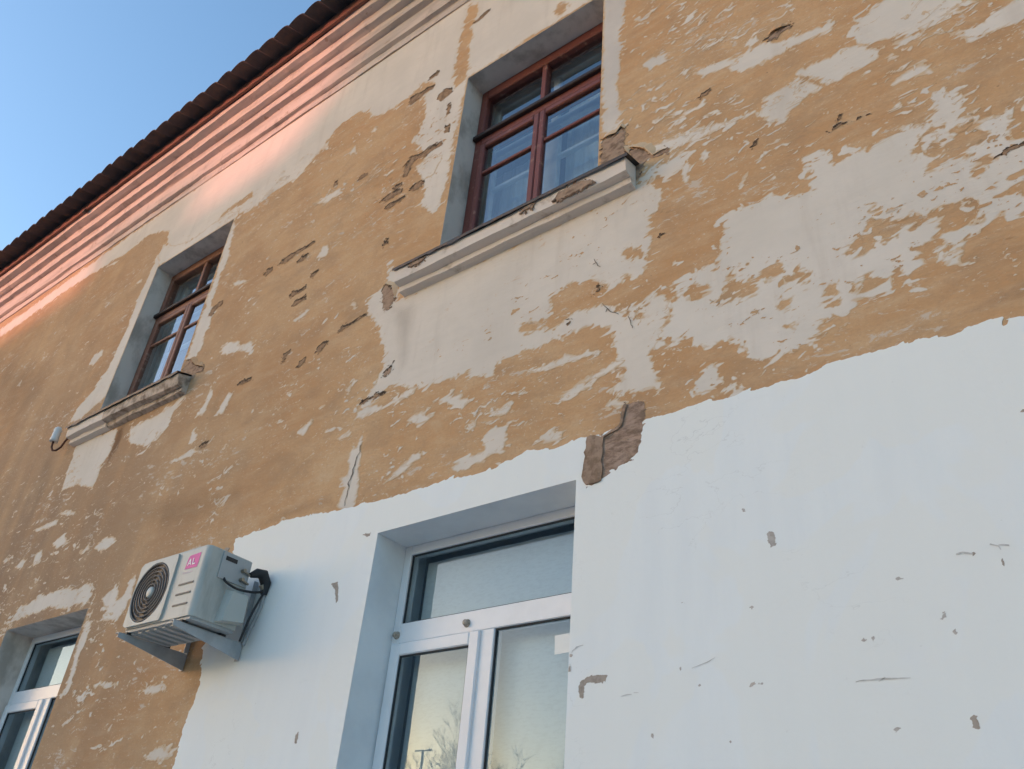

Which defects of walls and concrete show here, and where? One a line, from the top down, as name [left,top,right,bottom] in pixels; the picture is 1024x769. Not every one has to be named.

peeling [0,0,592,768]
peeling [578,675,608,698]
peeling [251,0,1024,509]
peeling [767,531,777,547]